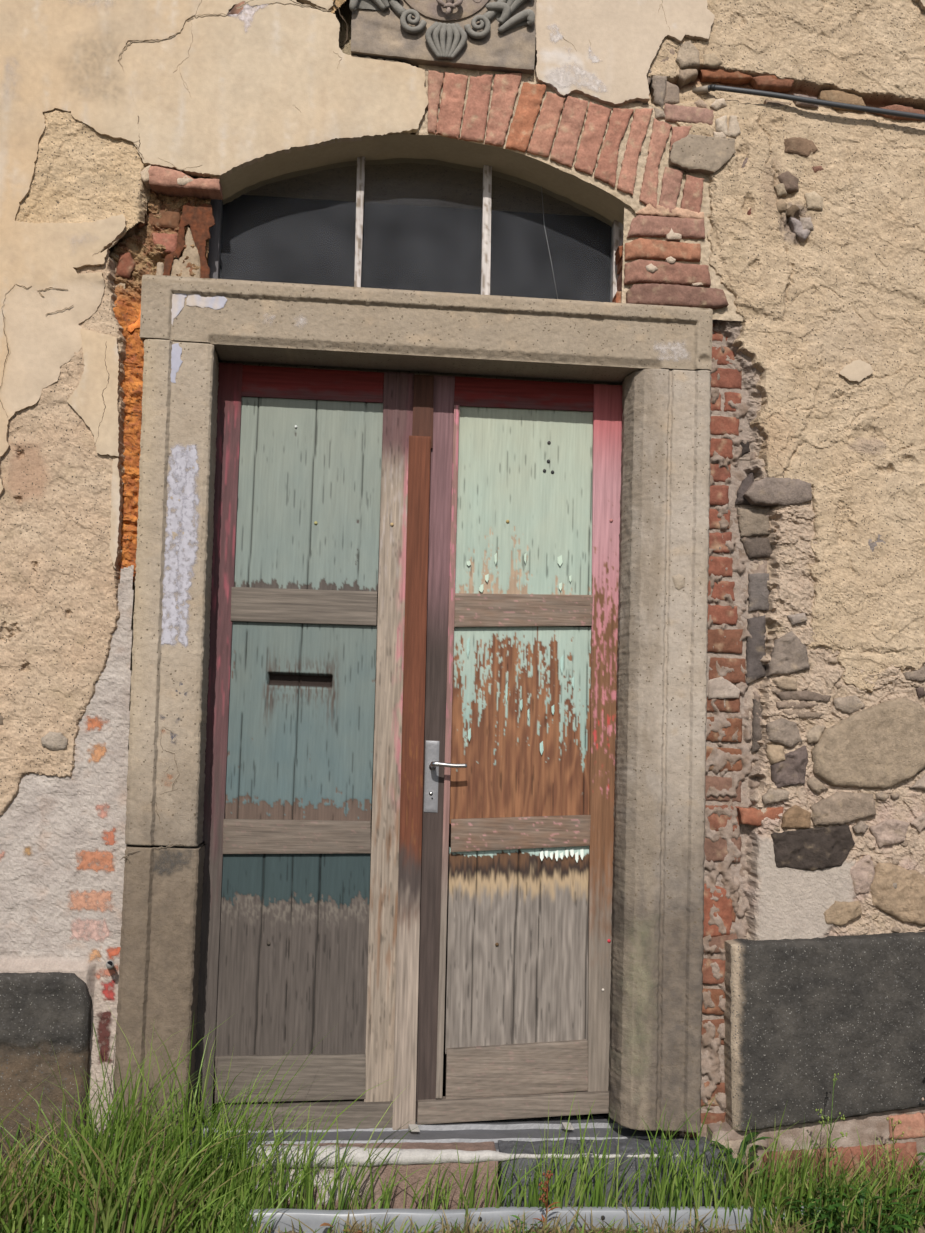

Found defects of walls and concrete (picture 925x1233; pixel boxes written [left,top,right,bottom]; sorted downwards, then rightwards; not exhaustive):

crack [119,0,253,97]
crack [290,0,348,69]
crack [135,115,201,170]
crack [0,284,73,417]
peeling [171,293,227,326]
spalling [416,0,925,1138]
spalling [0,109,211,1142]